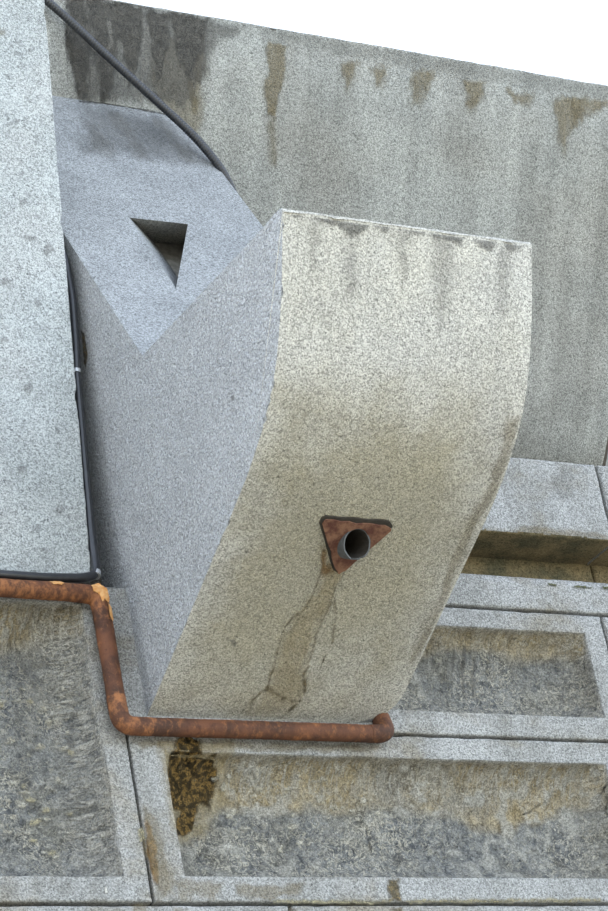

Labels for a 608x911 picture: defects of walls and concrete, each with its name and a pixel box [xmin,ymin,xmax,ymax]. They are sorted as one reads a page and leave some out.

damp [65,0,208,110]
damp [265,43,285,114]
damp [464,81,483,106]
damp [554,98,605,144]